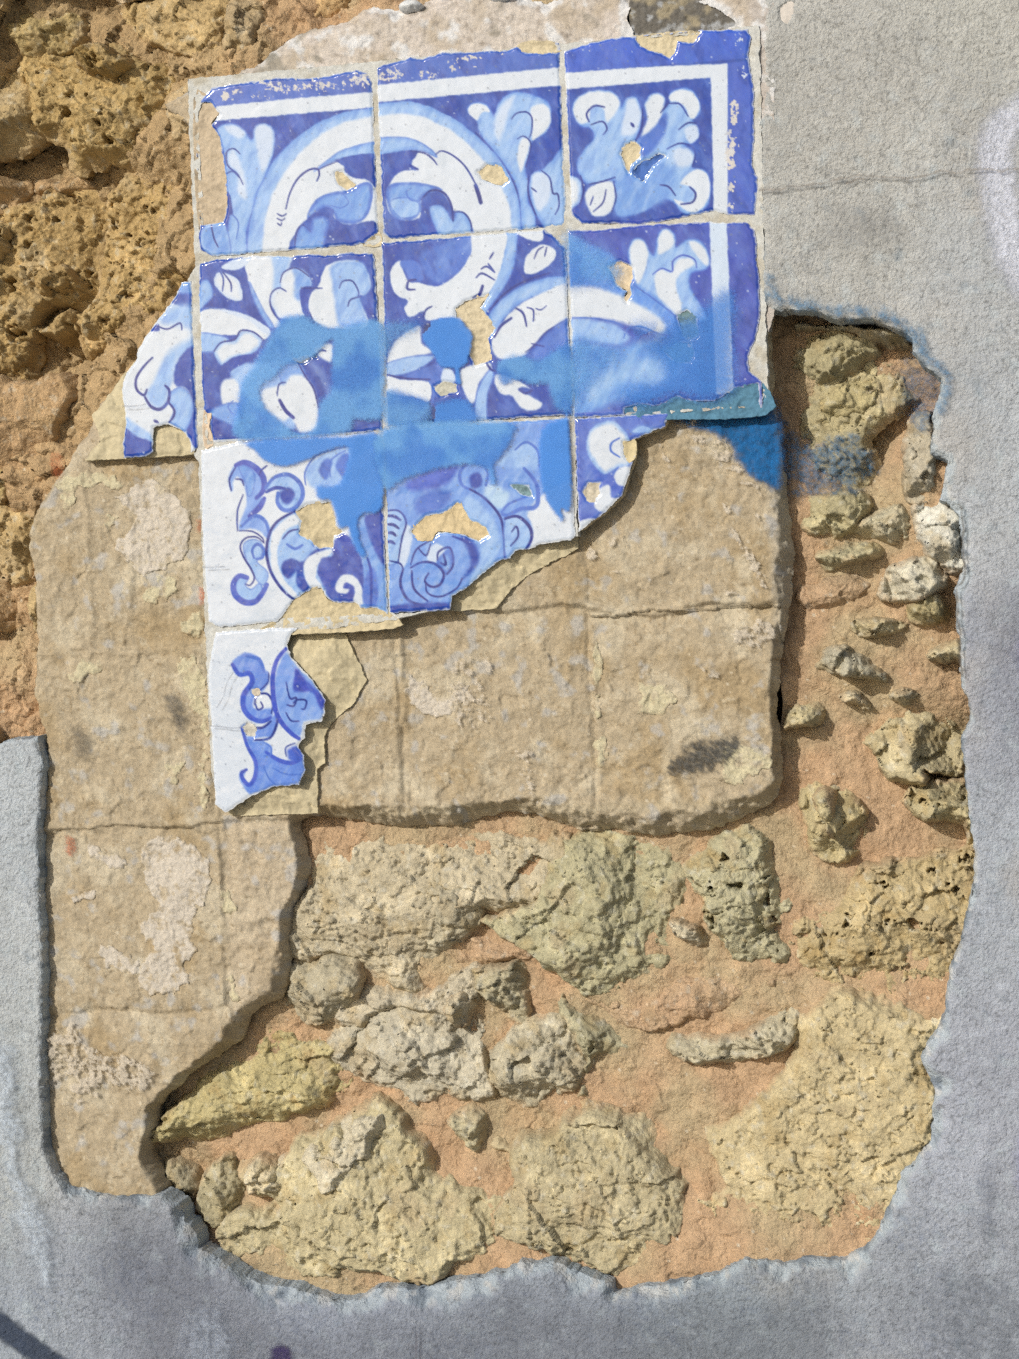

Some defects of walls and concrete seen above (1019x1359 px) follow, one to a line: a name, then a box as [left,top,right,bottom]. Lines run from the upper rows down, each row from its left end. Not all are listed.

spalling [517,40,562,54]
spalling [628,0,735,58]
peeling [780,1,794,23]
spalling [477,164,508,185]
spalling [621,141,665,181]
spalling [610,261,633,301]
spalling [455,293,496,365]
spalling [678,310,697,327]
spalling [0,0,430,744]
spalling [151,315,975,1295]
peeling [87,835,238,997]
peeling [47,1022,155,1103]